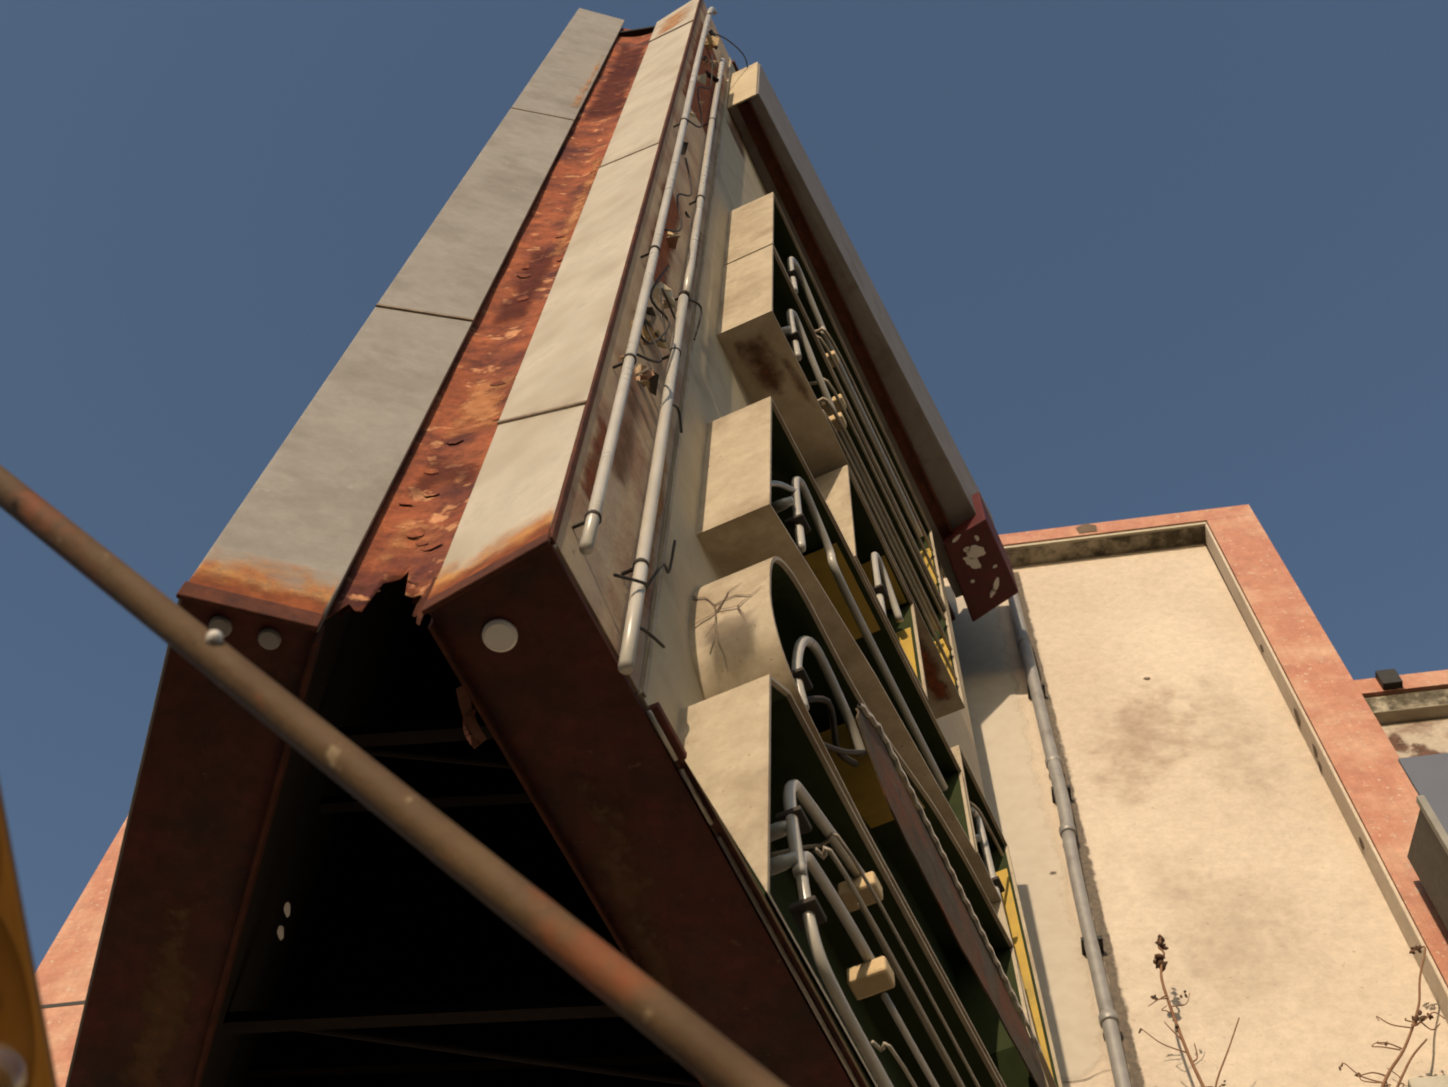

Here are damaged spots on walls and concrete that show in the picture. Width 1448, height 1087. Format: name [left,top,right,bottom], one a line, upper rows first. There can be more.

rust [575,47,644,117]
rust [495,159,603,321]
rust [446,377,513,444]
rust [581,391,637,500]
rust [398,463,477,505]
rust [188,559,336,614]
rust [427,511,554,600]
crack [692,583,760,637]